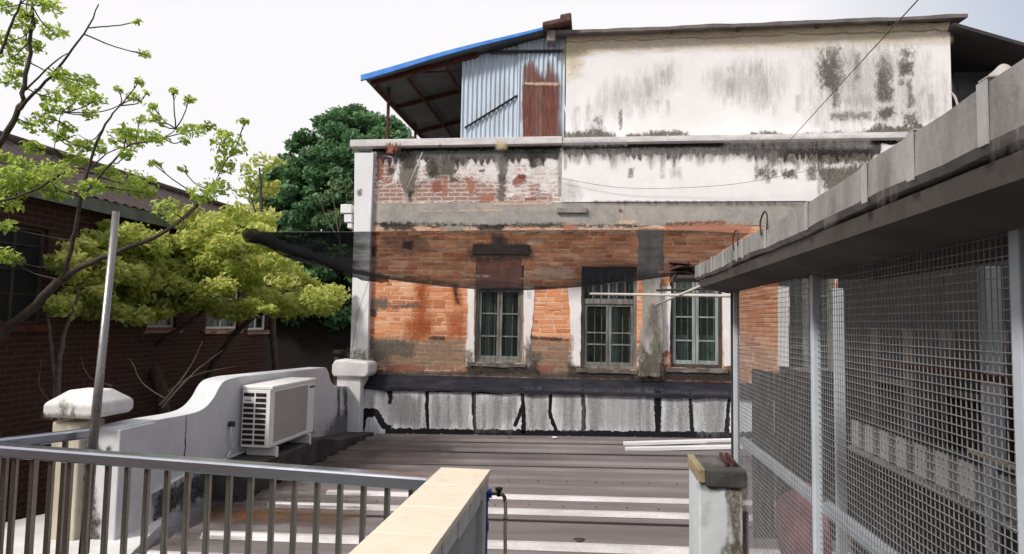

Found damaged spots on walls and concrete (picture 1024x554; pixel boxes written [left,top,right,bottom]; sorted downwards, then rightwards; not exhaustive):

corrosion [520,60,562,137]
water stain [372,30,945,210]
flaking render [372,155,637,232]
water stain [567,304,731,382]
crack [363,384,752,439]